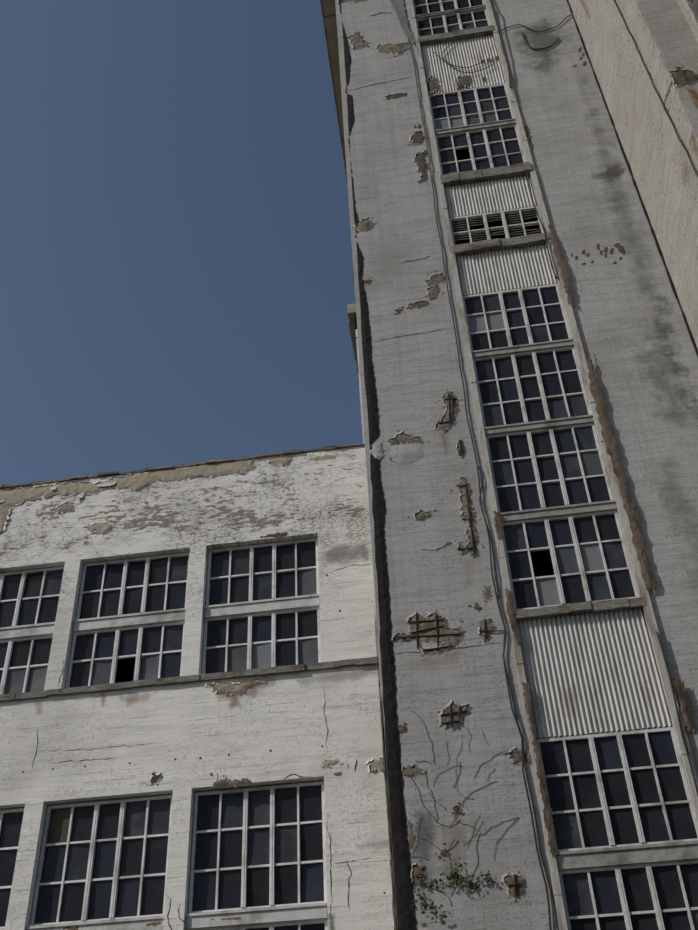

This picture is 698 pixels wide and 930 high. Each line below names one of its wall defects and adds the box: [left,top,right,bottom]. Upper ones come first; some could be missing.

spalling [434,390,462,433]
spalling [386,430,429,445]
spalling [456,439,466,458]
peeling [0,454,365,555]
spalling [450,475,485,559]
spalling [391,586,504,661]
peeling [204,678,269,697]
spalling [437,699,472,731]